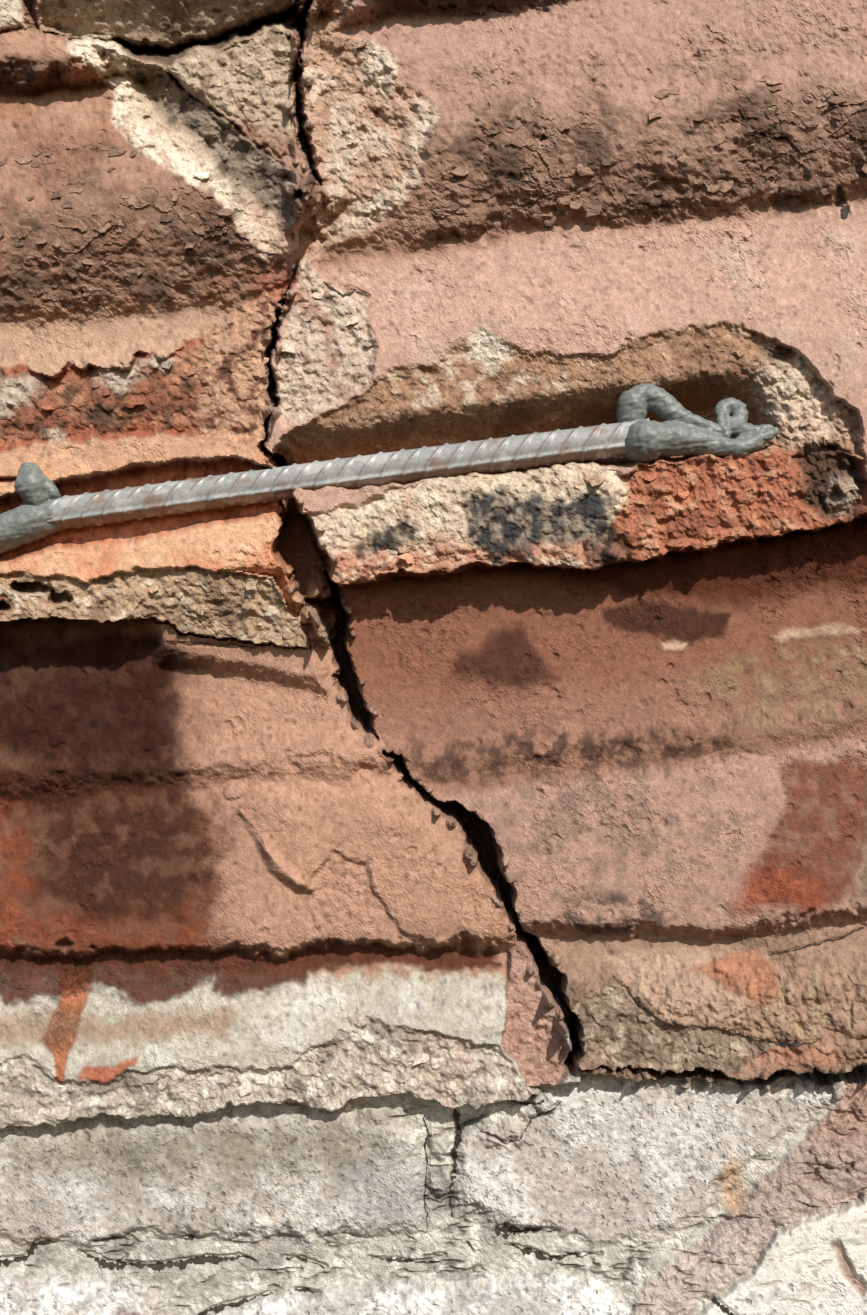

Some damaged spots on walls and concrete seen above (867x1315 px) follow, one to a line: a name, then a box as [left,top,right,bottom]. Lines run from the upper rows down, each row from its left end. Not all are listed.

spalling [0,0,867,587]
spalling [0,567,312,651]
damp [0,628,173,805]
crack [258,281,867,1263]
rust [0,766,220,1083]
spalling [0,1008,542,1129]
crack [711,1297,735,1315]